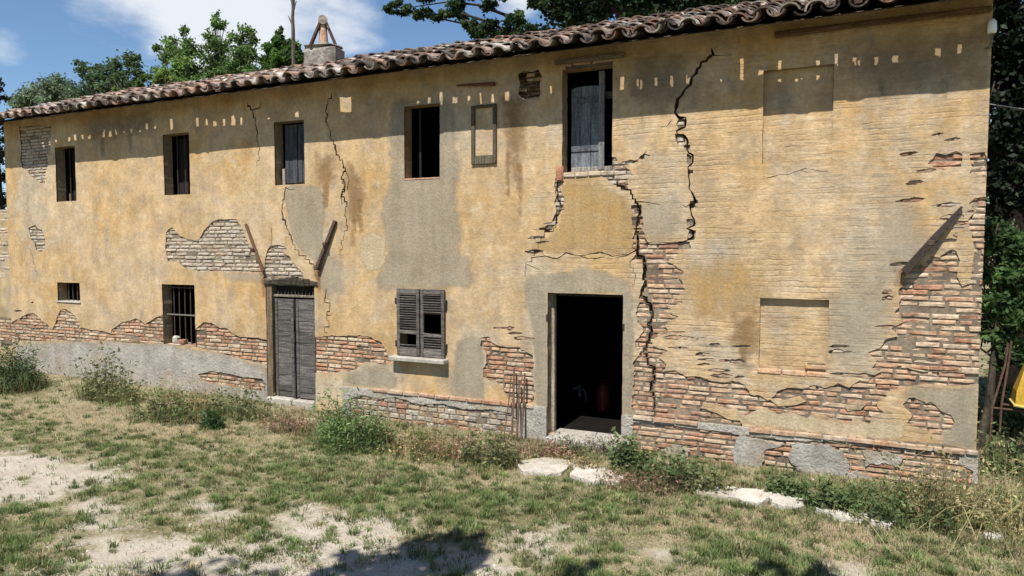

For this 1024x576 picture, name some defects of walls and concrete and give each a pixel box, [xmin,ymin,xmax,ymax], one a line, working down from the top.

flaking render [20,125,52,184]
crack [325,95,349,241]
flaking render [675,119,693,175]
flaking render [29,226,45,251]
flaking render [166,219,303,279]
crack [525,49,723,415]
flaking render [0,302,165,344]
flaking render [196,322,267,365]
flaking render [199,371,266,391]
flaking render [316,335,391,373]
flaking render [349,326,535,435]
flaking render [630,133,987,485]